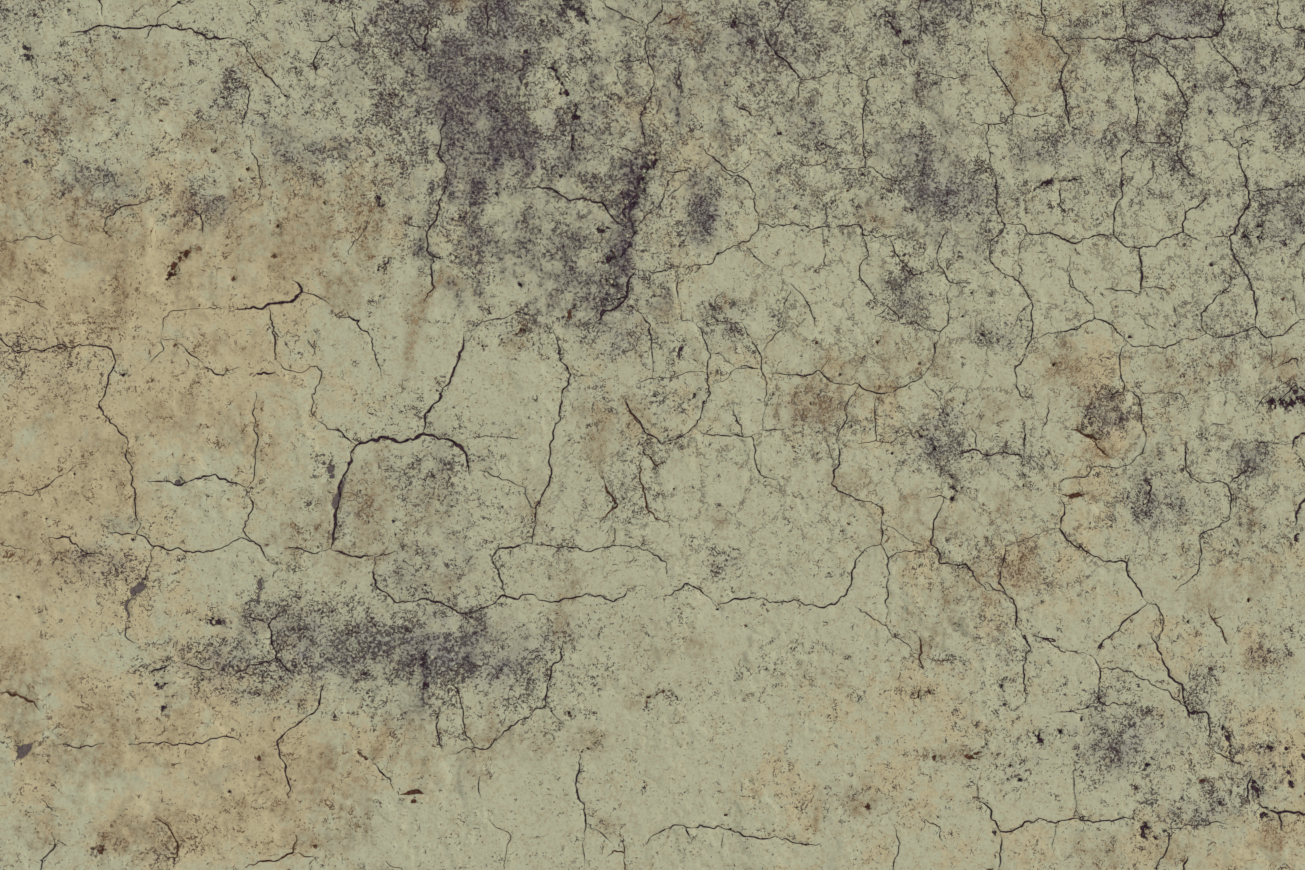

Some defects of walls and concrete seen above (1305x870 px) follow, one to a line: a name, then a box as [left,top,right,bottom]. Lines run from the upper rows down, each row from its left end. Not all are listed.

crack [71,0,287,215]
crack [404,108,450,301]
damp [409,35,642,315]
crack [524,169,687,229]
crack [0,338,273,579]
crack [142,280,667,614]
crack [592,0,1305,831]
crack [59,735,241,749]
crack [149,607,324,799]
crack [436,640,565,869]
crack [575,756,819,870]
crack [976,764,1134,867]